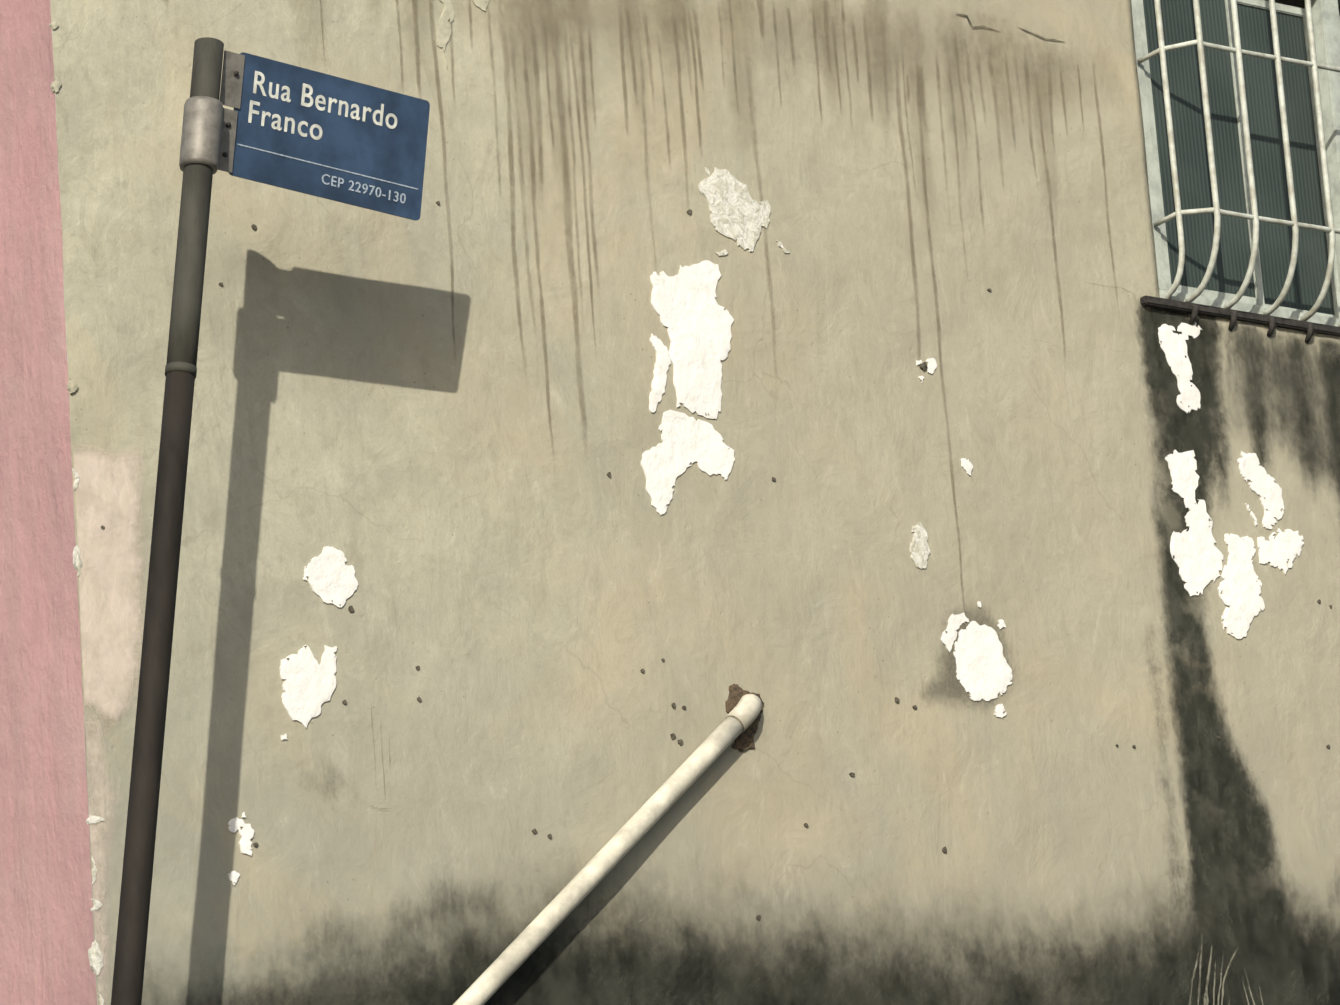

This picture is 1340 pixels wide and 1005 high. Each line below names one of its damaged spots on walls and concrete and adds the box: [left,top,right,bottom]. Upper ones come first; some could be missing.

peeling [437,0,454,69]
peeling [641,167,790,515]
peeling [1158,322,1202,413]
peeling [303,546,358,612]
peeling [909,522,930,569]
peeling [1165,450,1304,639]
peeling [279,645,347,740]
water stain [484,307,1340,1005]
peeling [935,601,1013,718]
peeling [228,871,240,885]
peeling [228,812,258,856]
water stain [235,932,514,1005]